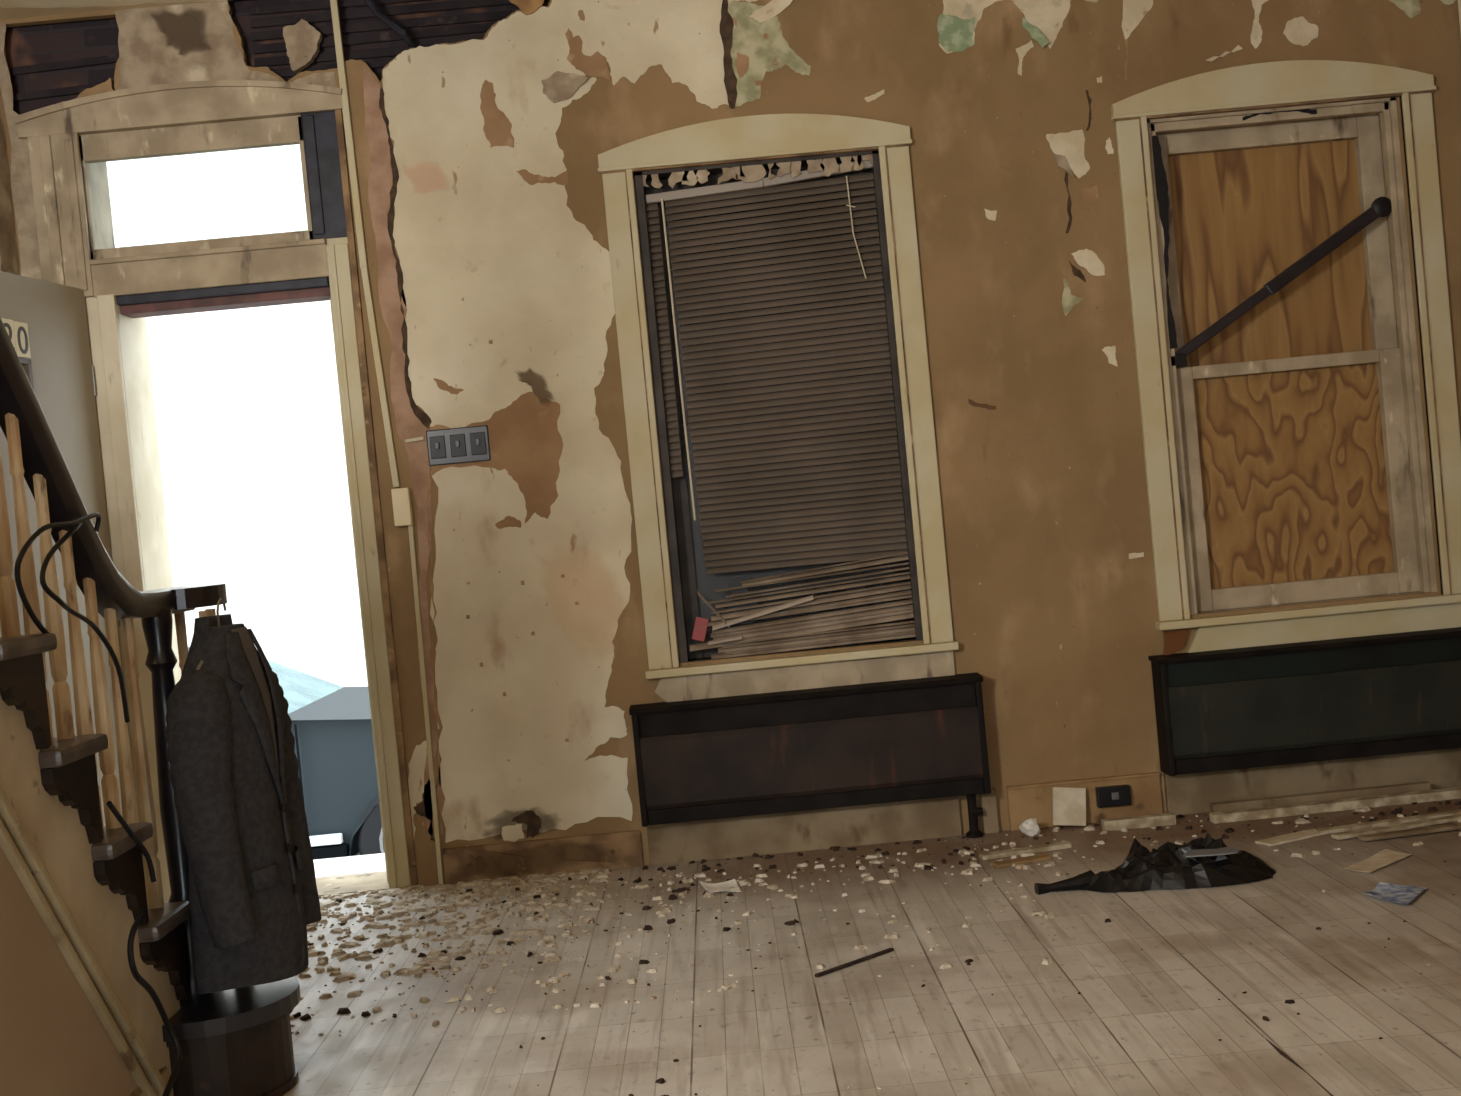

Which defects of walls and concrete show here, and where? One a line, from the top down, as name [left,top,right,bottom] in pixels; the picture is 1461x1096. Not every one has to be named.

peeling [937,0,1098,76]
peeling [1122,0,1153,80]
peeling [1206,0,1269,62]
peeling [1283,16,1319,46]
peeling [1389,0,1421,18]
peeling [642,154,873,188]
peeling [1046,130,1099,206]
peeling [985,209,997,221]
peeling [1062,249,1105,316]
peeling [1102,346,1118,367]
peeling [0,0,811,843]
crack [1245,1020,1334,1096]